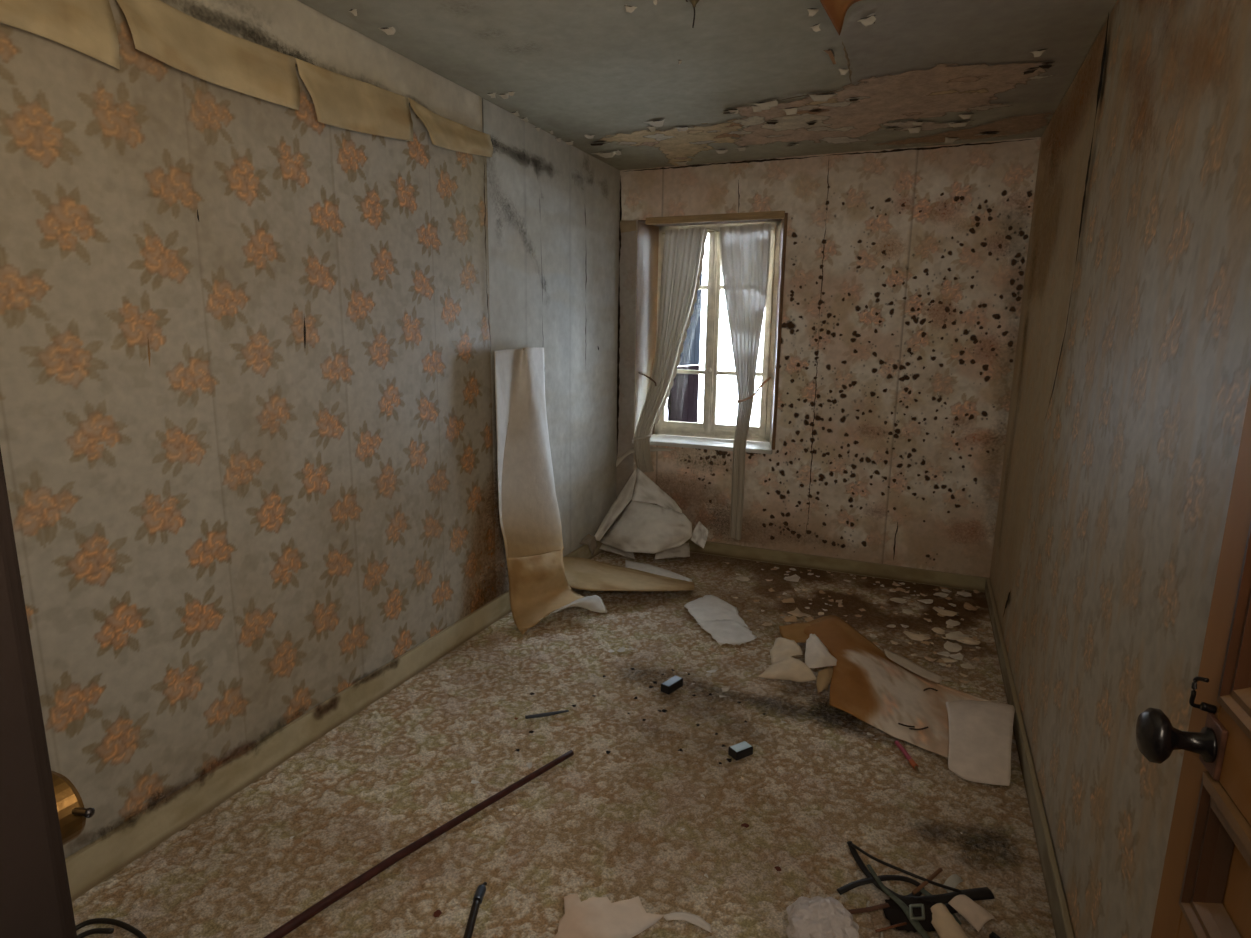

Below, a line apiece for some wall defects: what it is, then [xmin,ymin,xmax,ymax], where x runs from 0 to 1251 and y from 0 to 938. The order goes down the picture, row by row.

peeling [486,42,1054,166]
water stain [746,199,1028,548]
water stain [680,448,730,486]
water stain [315,697,337,717]
water stain [148,710,300,807]